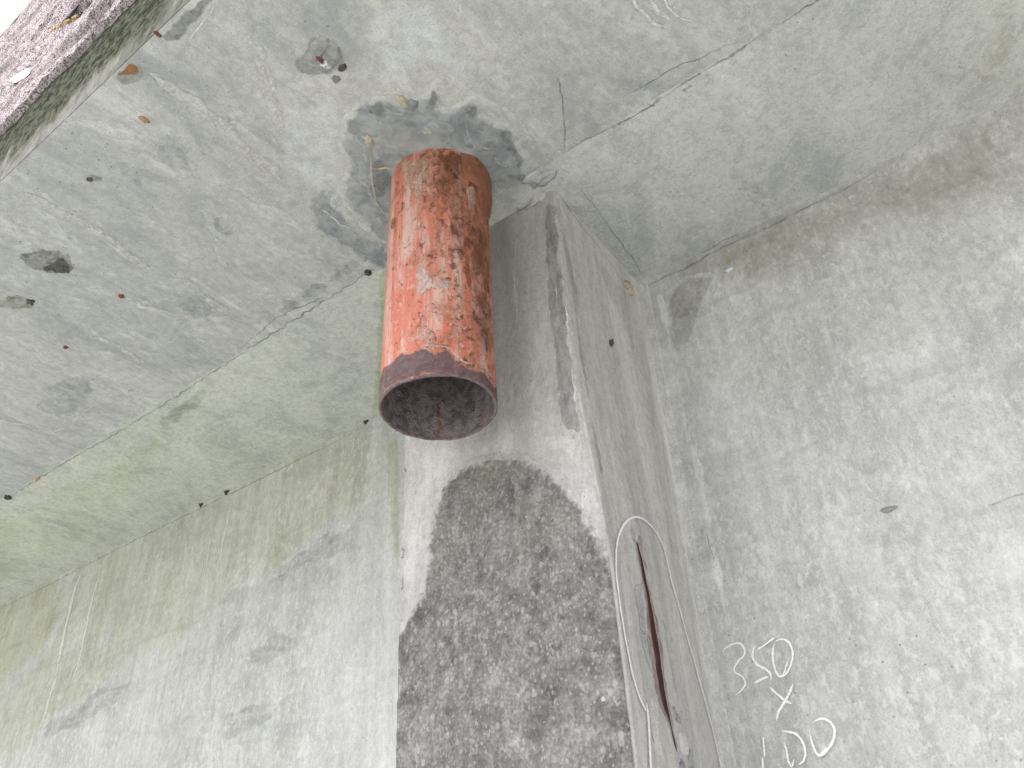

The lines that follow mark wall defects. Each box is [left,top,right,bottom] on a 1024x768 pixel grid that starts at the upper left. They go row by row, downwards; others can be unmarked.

crack [674,51,742,95]
spalling [16,245,78,277]
crack [631,528,694,768]